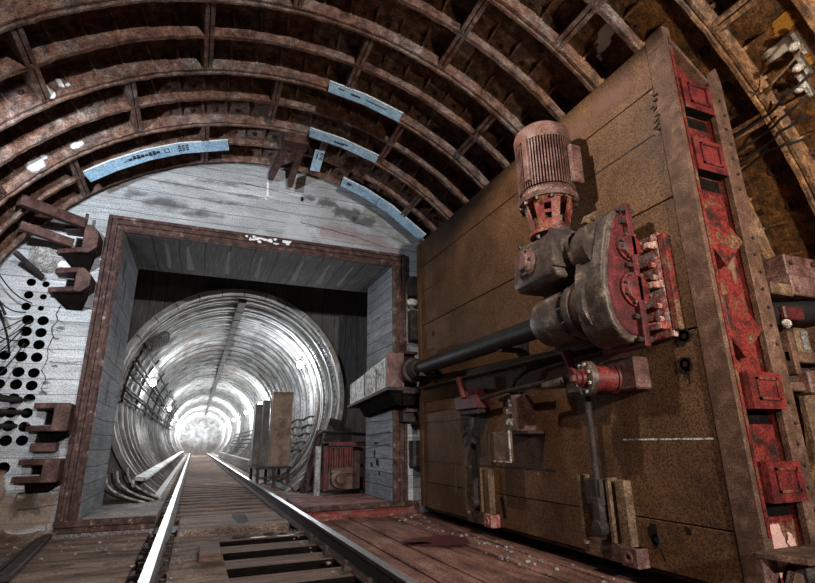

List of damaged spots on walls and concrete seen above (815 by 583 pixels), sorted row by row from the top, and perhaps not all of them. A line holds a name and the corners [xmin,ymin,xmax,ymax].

peeling [770,524,797,549]